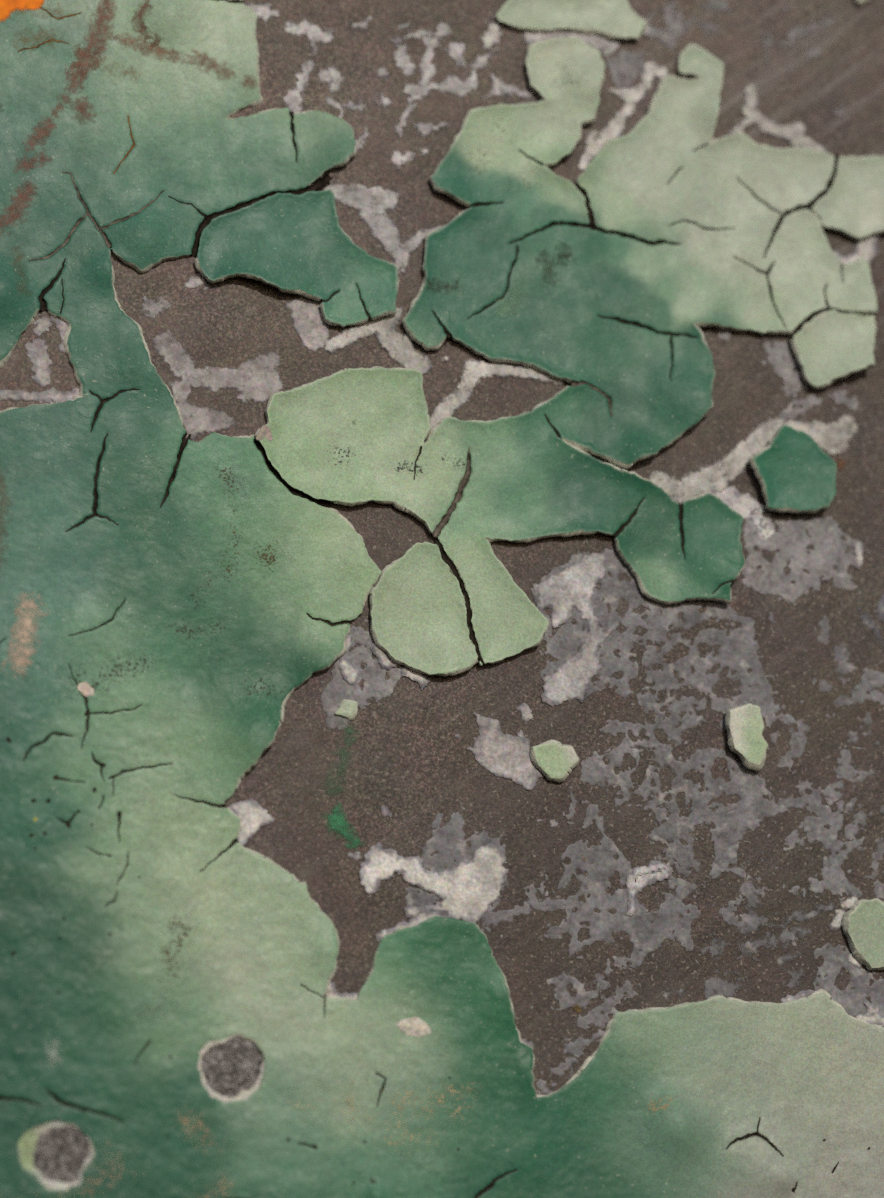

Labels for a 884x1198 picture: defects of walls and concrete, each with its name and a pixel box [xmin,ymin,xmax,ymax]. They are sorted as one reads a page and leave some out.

corrosion [0,0,175,225]
crack [28,111,333,314]
crack [432,154,849,338]
crack [65,388,140,532]
crack [253,440,331,507]
crack [432,447,484,664]
peeling [110,0,884,994]
spalling [19,1121,93,1190]
spalling [198,1034,264,1102]
spalling [396,1017,431,1037]
peeling [476,804,855,1095]
crack [726,1117,784,1156]